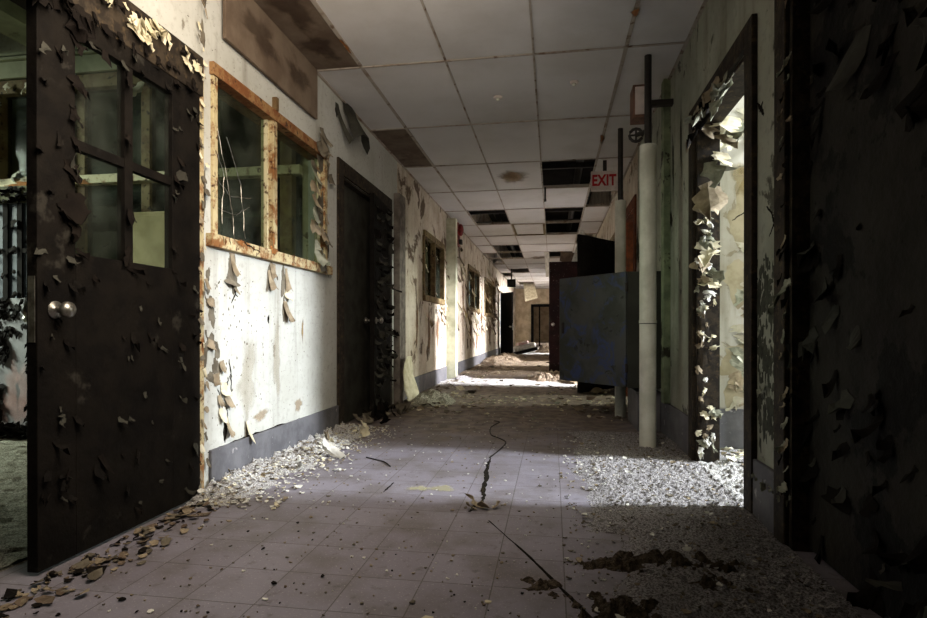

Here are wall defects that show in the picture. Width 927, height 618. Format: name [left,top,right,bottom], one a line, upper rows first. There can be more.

peeling [32,0,256,495]
peeling [264,261,295,325]
leakage [502,172,524,182]
peeling [683,72,744,462]
peeling [751,235,792,507]